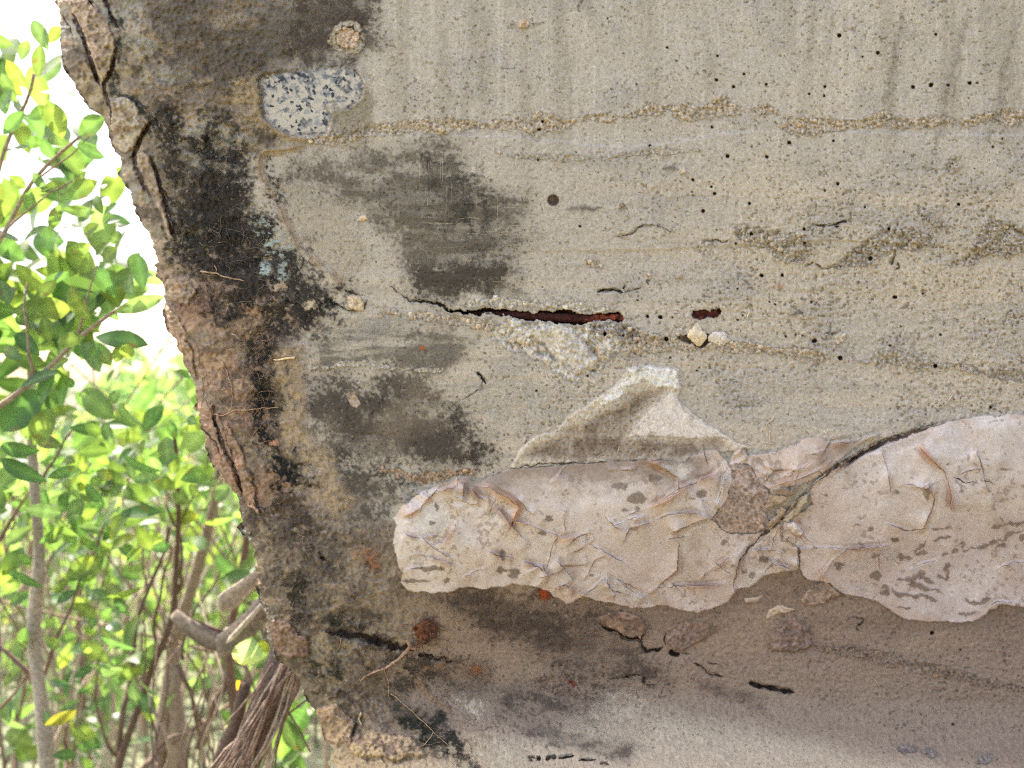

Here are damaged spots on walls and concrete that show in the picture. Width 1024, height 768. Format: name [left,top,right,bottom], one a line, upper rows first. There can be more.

water stain [148,0,527,521]
crack [325,279,651,325]
corrosion [471,311,624,323]
peeling [511,365,749,469]
spalling [766,583,843,618]